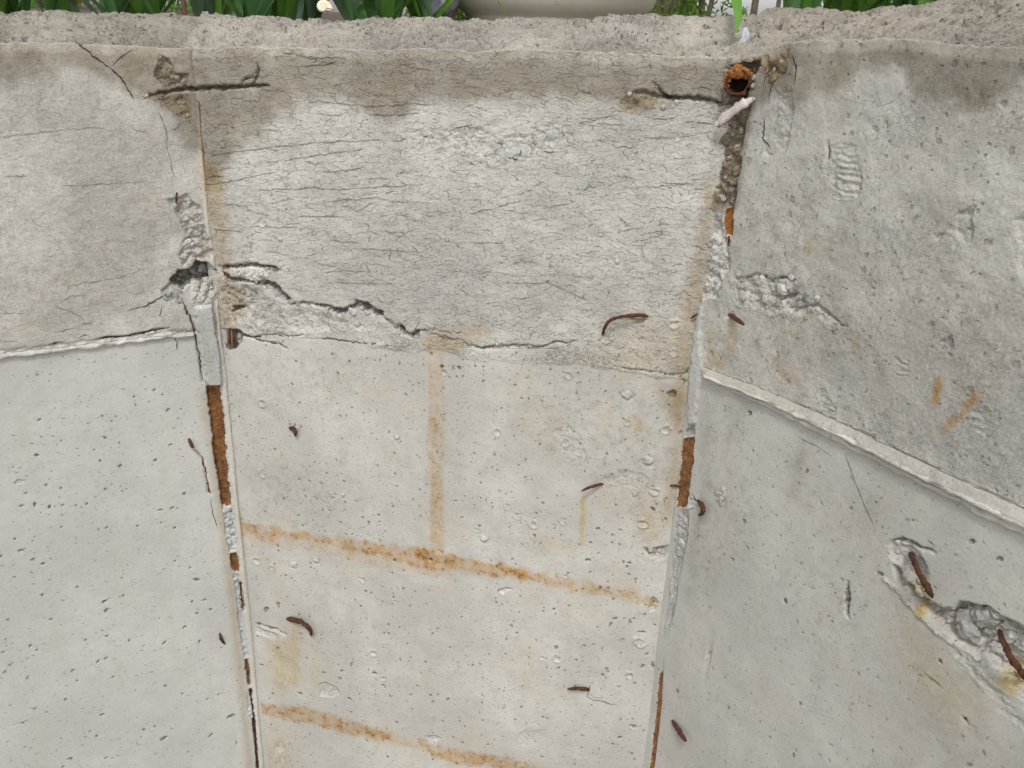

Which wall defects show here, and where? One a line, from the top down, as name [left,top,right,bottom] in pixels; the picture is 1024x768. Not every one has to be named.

crack [48,268,203,380]
crack [7,38,272,174]
peeling [161,193,687,398]
crack [206,52,723,349]
spalling [877,540,1024,735]